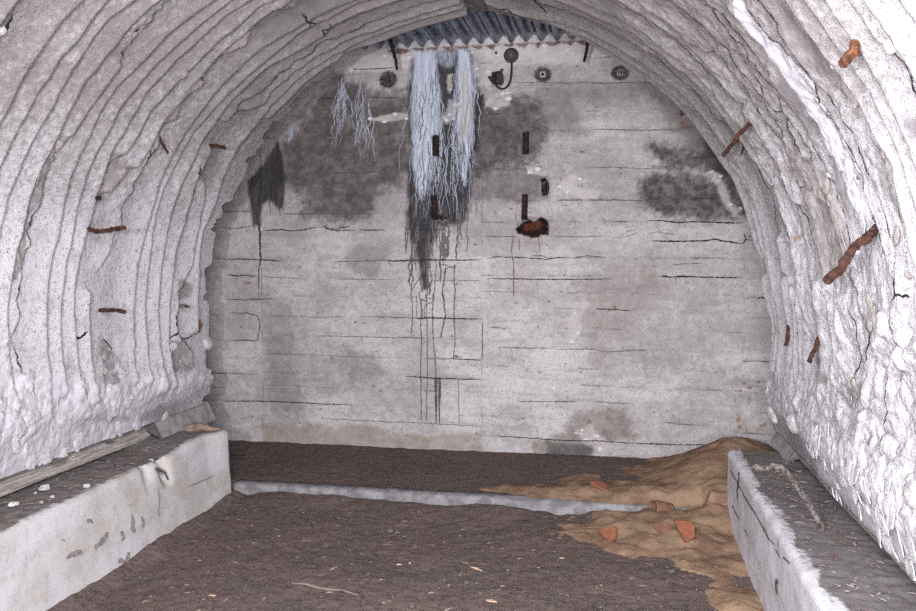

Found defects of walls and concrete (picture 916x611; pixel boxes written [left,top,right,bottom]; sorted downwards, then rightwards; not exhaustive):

crack [595,126,678,134]
crack [590,164,677,172]
water stain [640,143,746,220]
crack [234,213,384,231]
water stain [248,49,547,423]
crack [169,310,198,365]
crack [228,258,534,380]
crack [556,349,630,370]